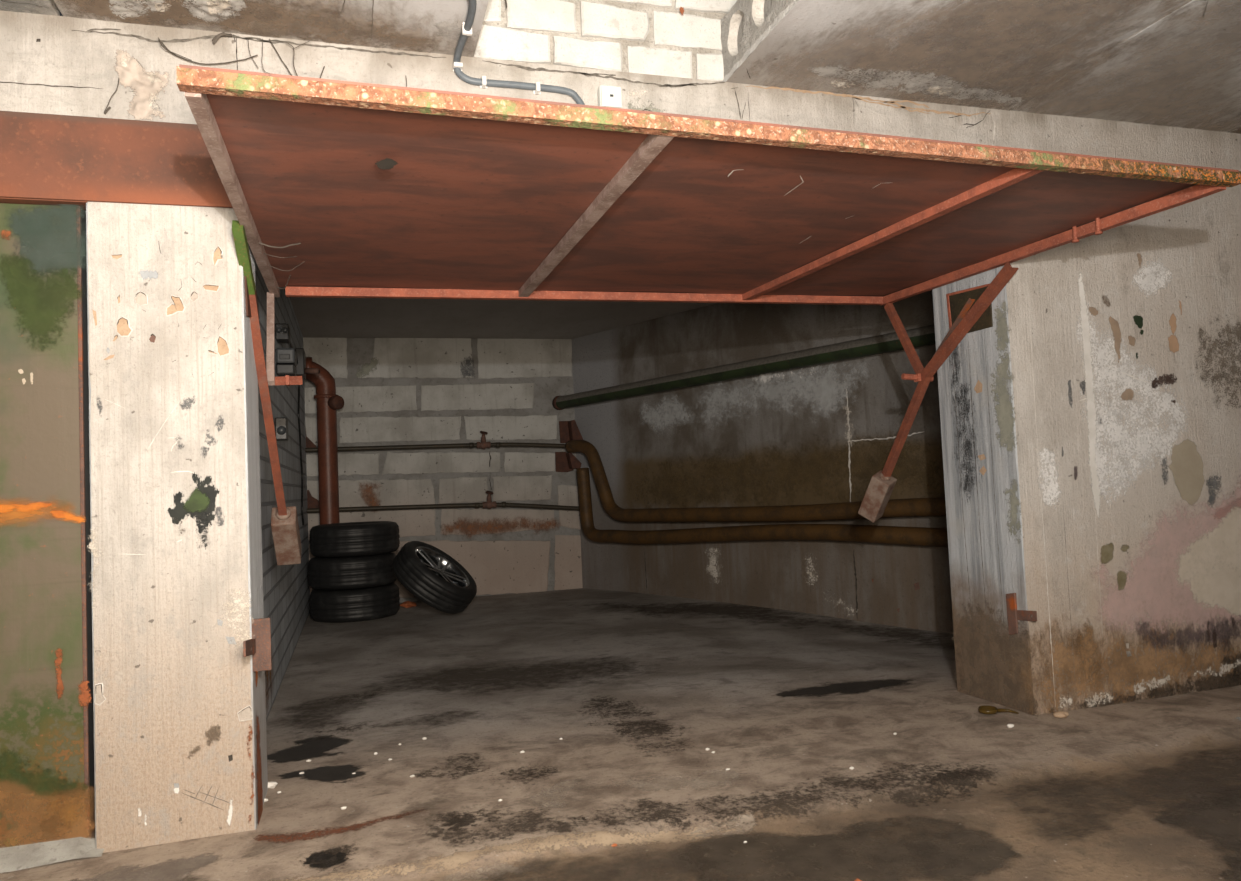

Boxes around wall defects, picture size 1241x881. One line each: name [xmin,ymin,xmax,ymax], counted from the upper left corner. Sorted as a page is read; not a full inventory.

leakage [63,0,433,52]
crack [0,0,446,112]
leakage [772,0,1241,134]
crack [482,60,996,146]
spalling [103,291,148,360]
spalling [165,284,220,316]
spalling [208,335,230,357]
peeling [1133,315,1144,335]
rust [0,502,85,523]
leakage [1140,618,1241,677]
rust [55,648,92,706]
leakage [1133,675,1171,694]